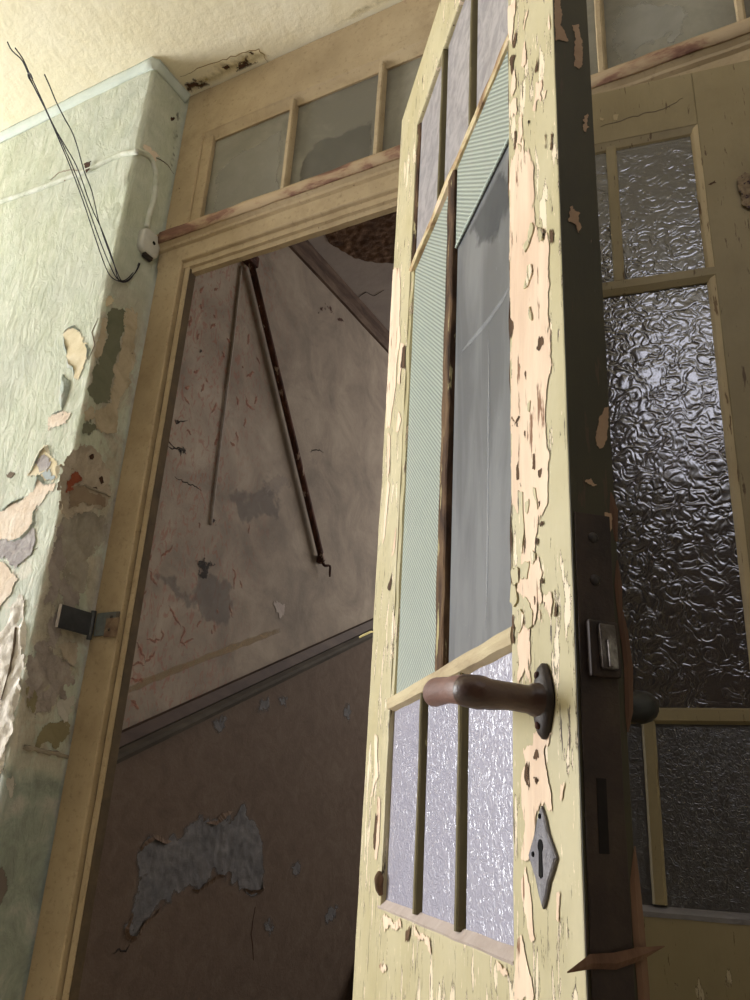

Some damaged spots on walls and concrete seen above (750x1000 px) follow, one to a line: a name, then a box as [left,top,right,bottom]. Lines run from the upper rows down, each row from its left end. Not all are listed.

spalling [325,211,397,264]
spalling [0,296,138,798]
peeling [124,804,265,942]